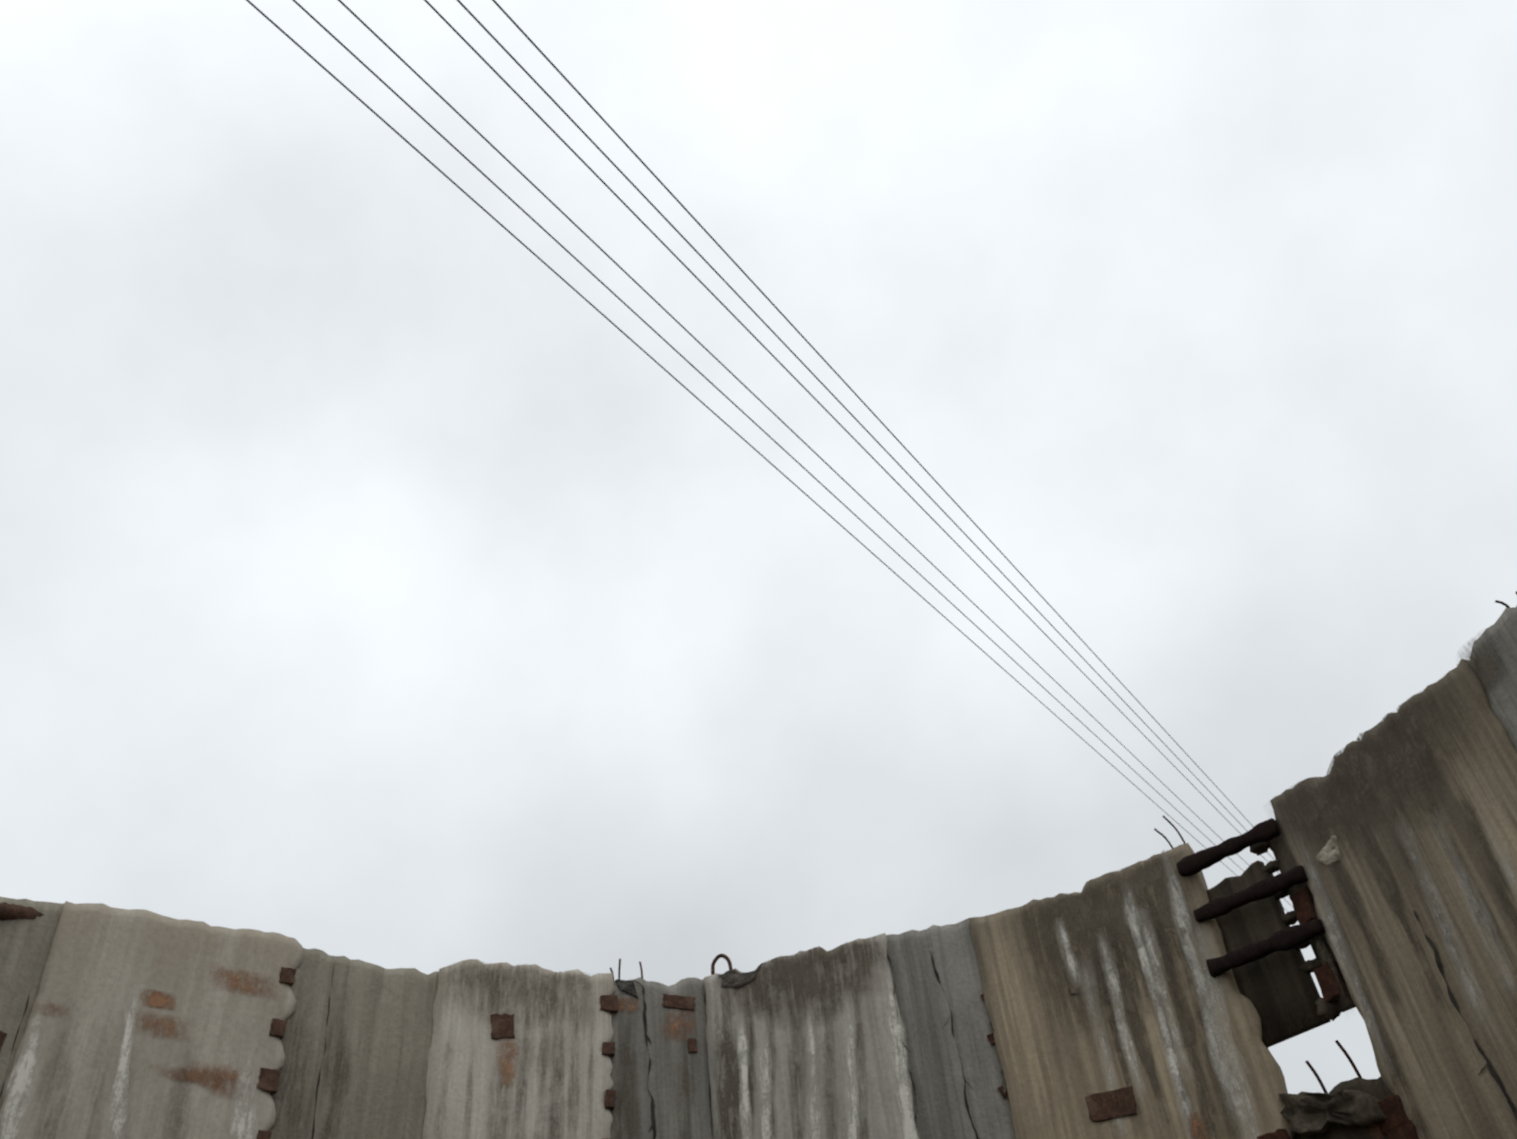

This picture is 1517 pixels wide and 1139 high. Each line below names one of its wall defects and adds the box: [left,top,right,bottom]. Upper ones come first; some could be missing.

water stain [1,1015,39,1139]
water stain [110,1001,135,1139]
corrosion [142,991,177,1035]
water stain [230,1060,257,1139]
spalling [615,979,638,998]
spalling [717,962,767,988]
water stain [715,939,880,1139]
water stain [888,982,919,1139]
crack [1414,911,1517,1121]